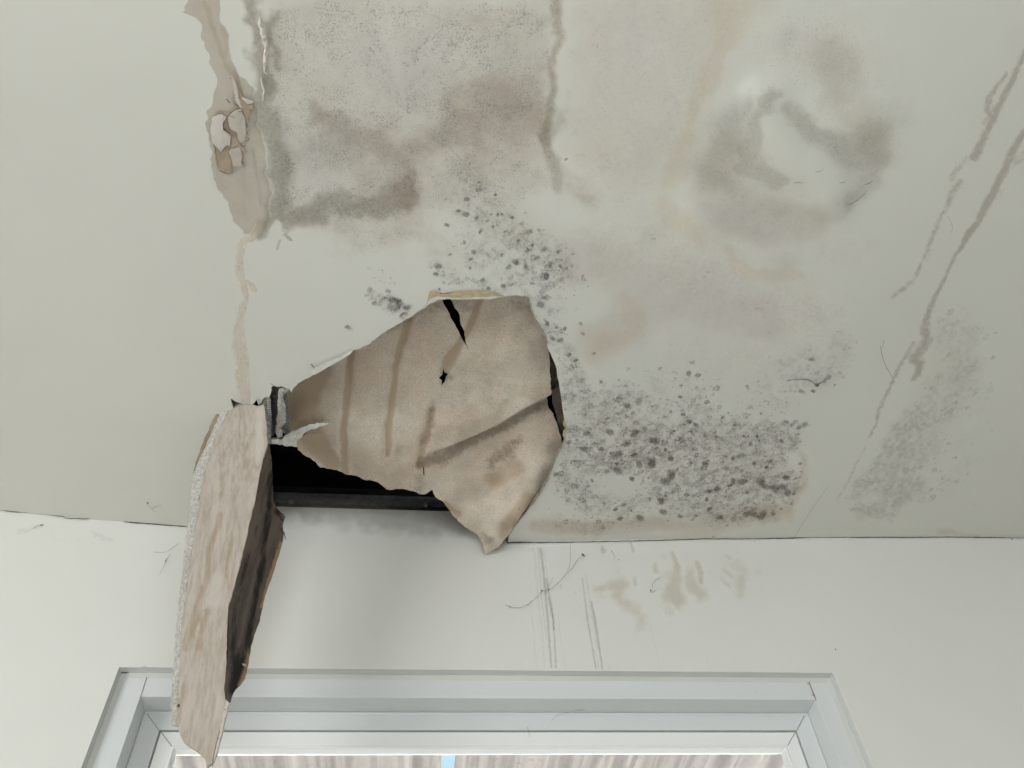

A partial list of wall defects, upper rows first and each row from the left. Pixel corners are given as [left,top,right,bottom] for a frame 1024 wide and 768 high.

peeling [211,71,254,177]
leakage [179,0,898,547]
leakage [835,285,1017,534]